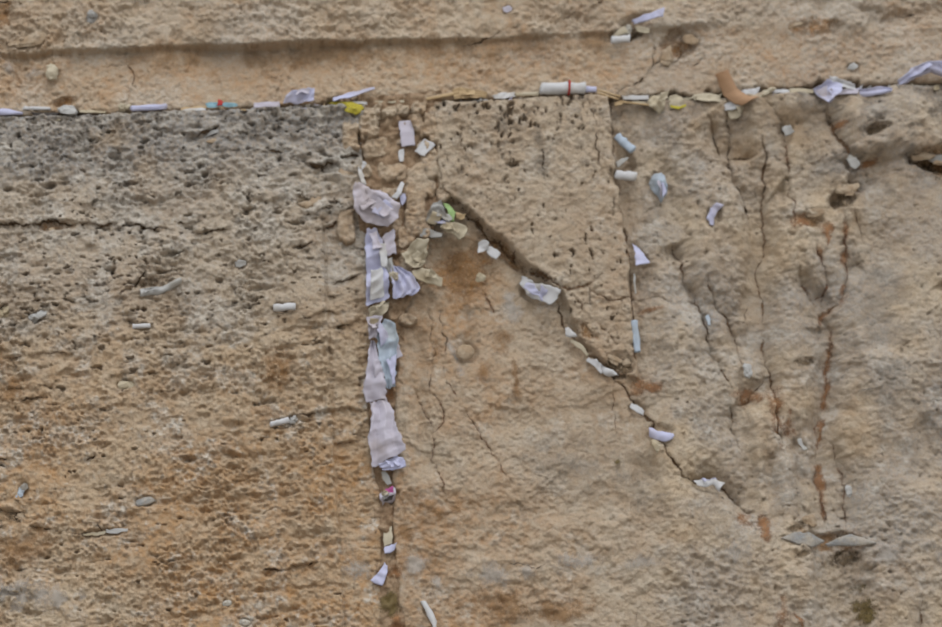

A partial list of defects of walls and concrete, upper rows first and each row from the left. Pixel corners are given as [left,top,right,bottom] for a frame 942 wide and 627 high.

crack [826,116,850,154]
crack [694,120,790,443]
crack [801,217,861,390]
crack [417,317,506,490]
crack [813,426,846,521]